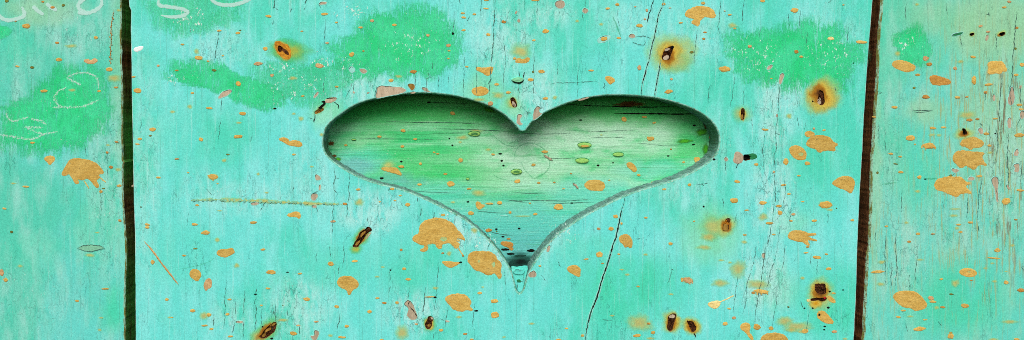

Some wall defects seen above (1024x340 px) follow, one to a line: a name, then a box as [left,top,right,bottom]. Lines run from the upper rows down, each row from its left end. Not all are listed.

rust [274,41,304,60]
rust [653,39,694,70]
rust [807,81,838,112]
rust [351,227,372,252]
rust [705,218,734,236]
crack [584,198,640,340]
rust [807,280,831,308]
rust [253,321,277,340]
rust [665,312,701,337]